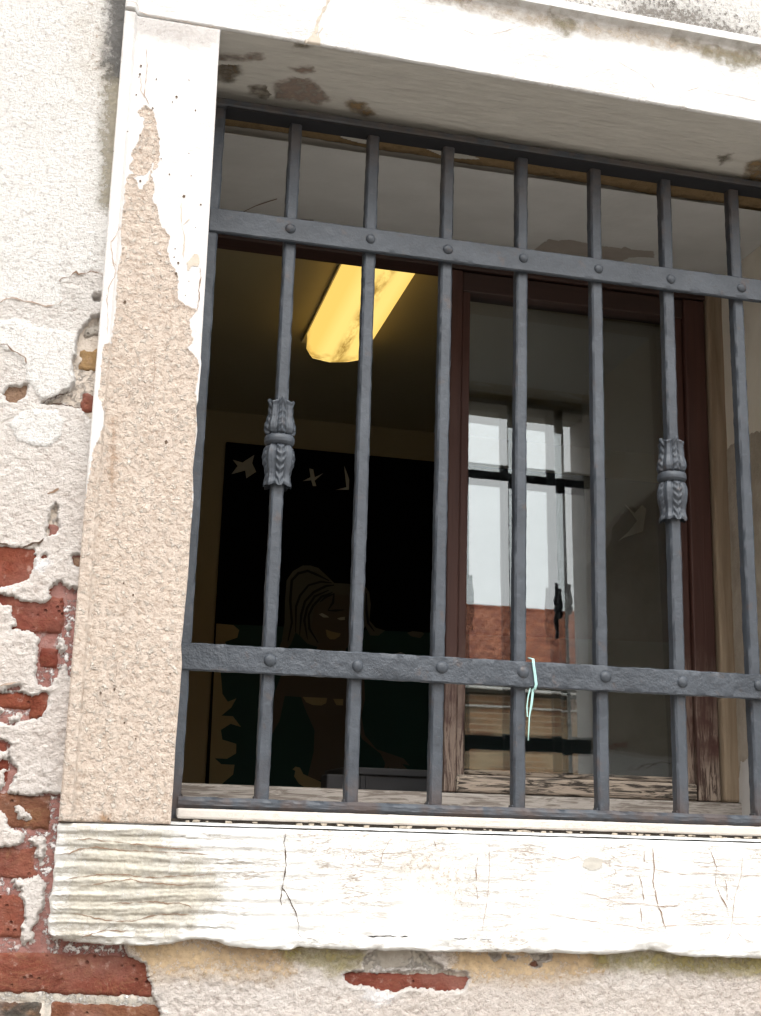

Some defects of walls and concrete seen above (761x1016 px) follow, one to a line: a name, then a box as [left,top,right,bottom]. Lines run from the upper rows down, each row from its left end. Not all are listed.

crack [305,0,330,44]
peeling [0,105,199,1016]
crack [280,834,313,939]
crack [639,848,666,928]
crack [711,852,754,944]
spalling [343,950,469,992]